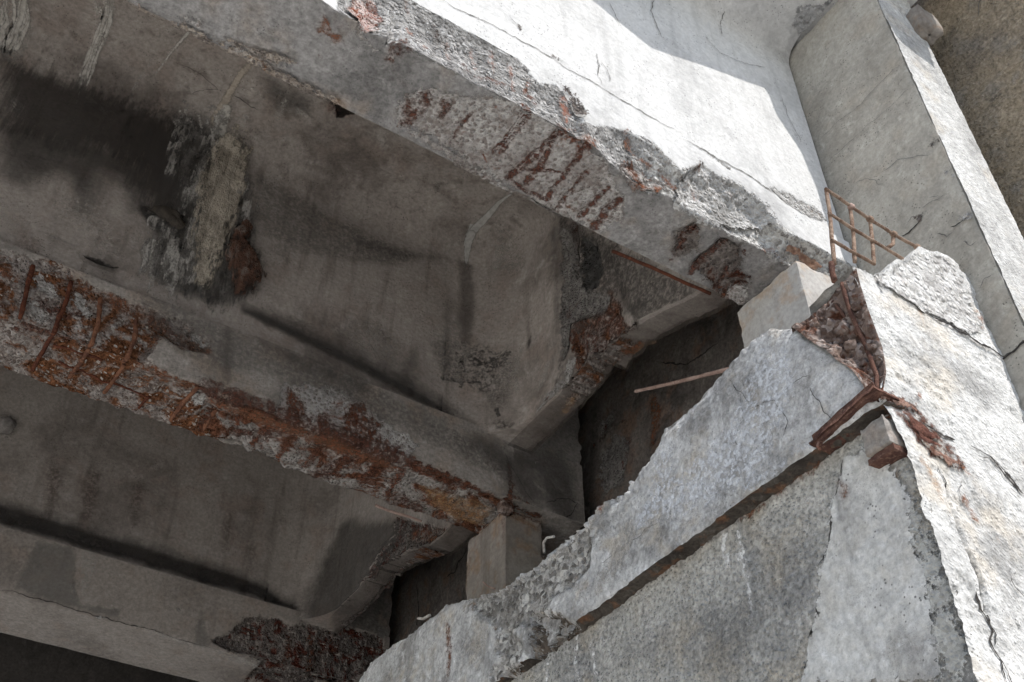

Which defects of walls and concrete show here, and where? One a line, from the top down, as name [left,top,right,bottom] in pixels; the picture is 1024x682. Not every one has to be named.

damp [0,0,30,53]
damp [77,1,113,89]
spalling [125,0,343,107]
damp [11,136,132,269]
spalling [337,0,886,412]
corrosion [828,261,837,283]
damp [243,309,446,413]
crack [898,294,1024,360]
spalling [0,250,502,682]
corrosion [195,378,542,531]
corrosion [799,382,970,477]
spalling [469,529,592,682]